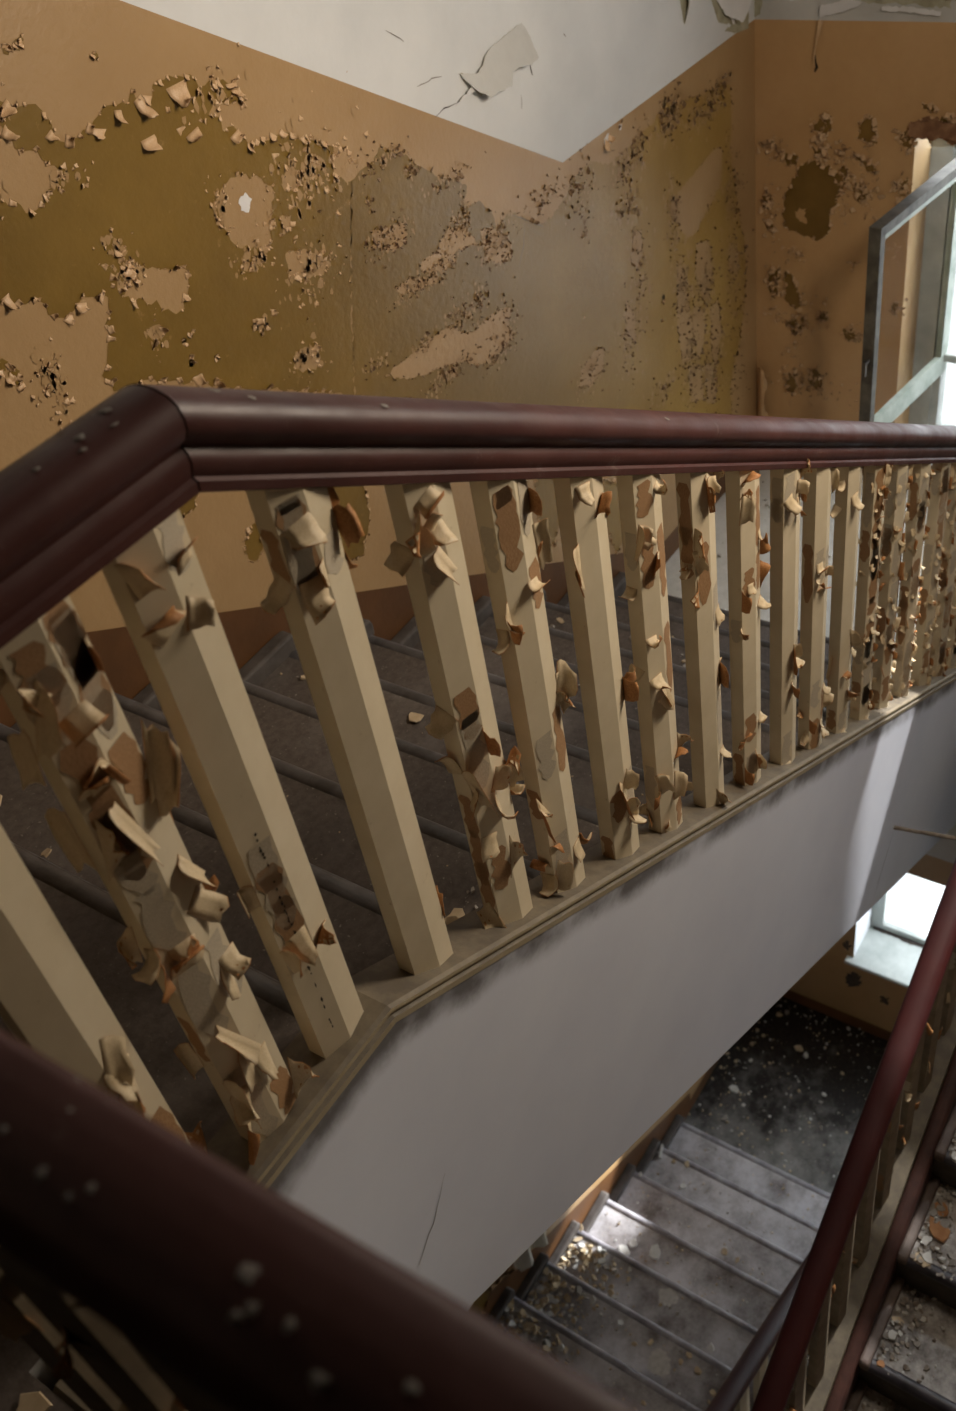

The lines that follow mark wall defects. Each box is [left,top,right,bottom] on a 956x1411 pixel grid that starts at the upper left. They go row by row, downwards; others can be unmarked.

peeling [0,65,956,429]
peeling [242,486,371,597]
peeling [424,545,446,587]
peeling [480,479,559,609]
peeling [602,476,711,606]
peeling [742,471,796,597]
peeling [802,544,829,603]
peeling [810,463,956,749]
peeling [9,600,159,897]
peeling [454,687,511,908]
peeling [248,835,304,942]
peeling [168,960,229,1062]